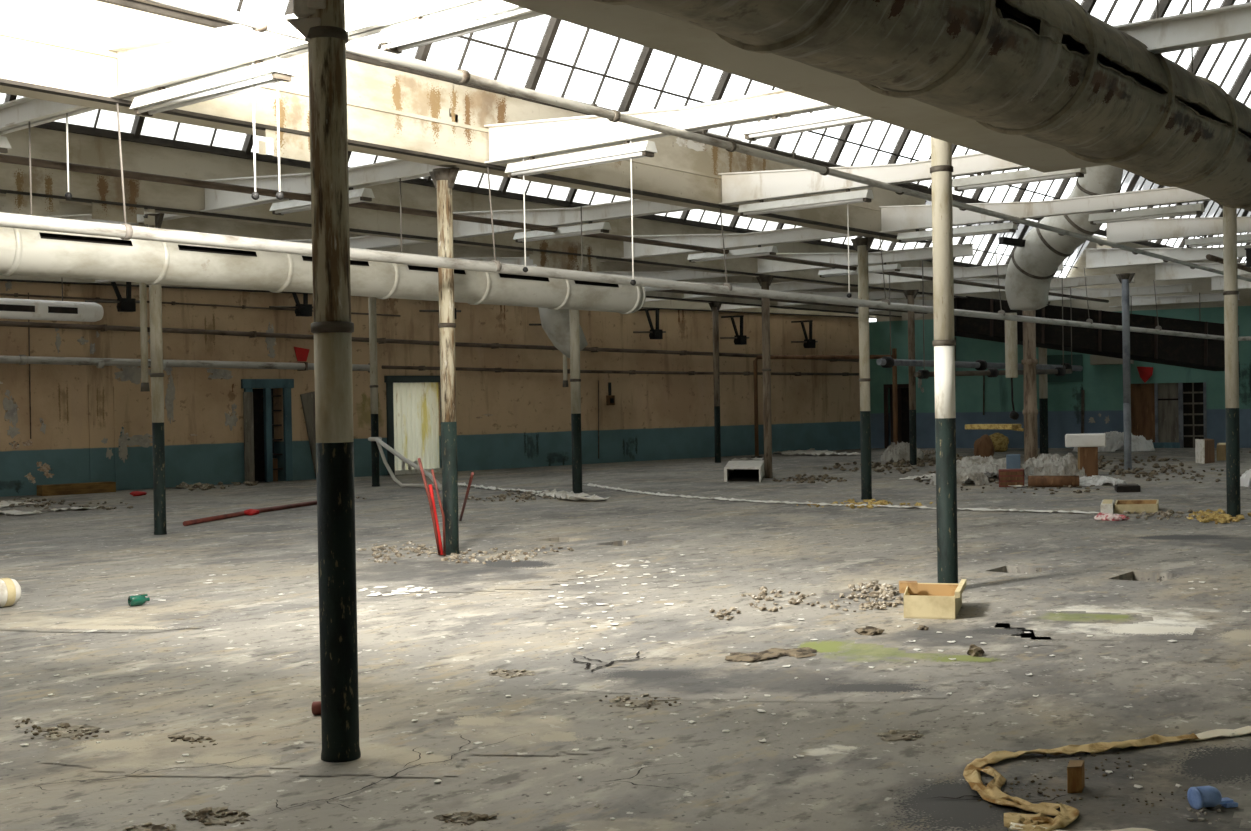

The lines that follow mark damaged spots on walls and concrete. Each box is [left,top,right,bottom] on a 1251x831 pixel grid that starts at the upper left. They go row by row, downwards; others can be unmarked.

rust [449,85,523,152]